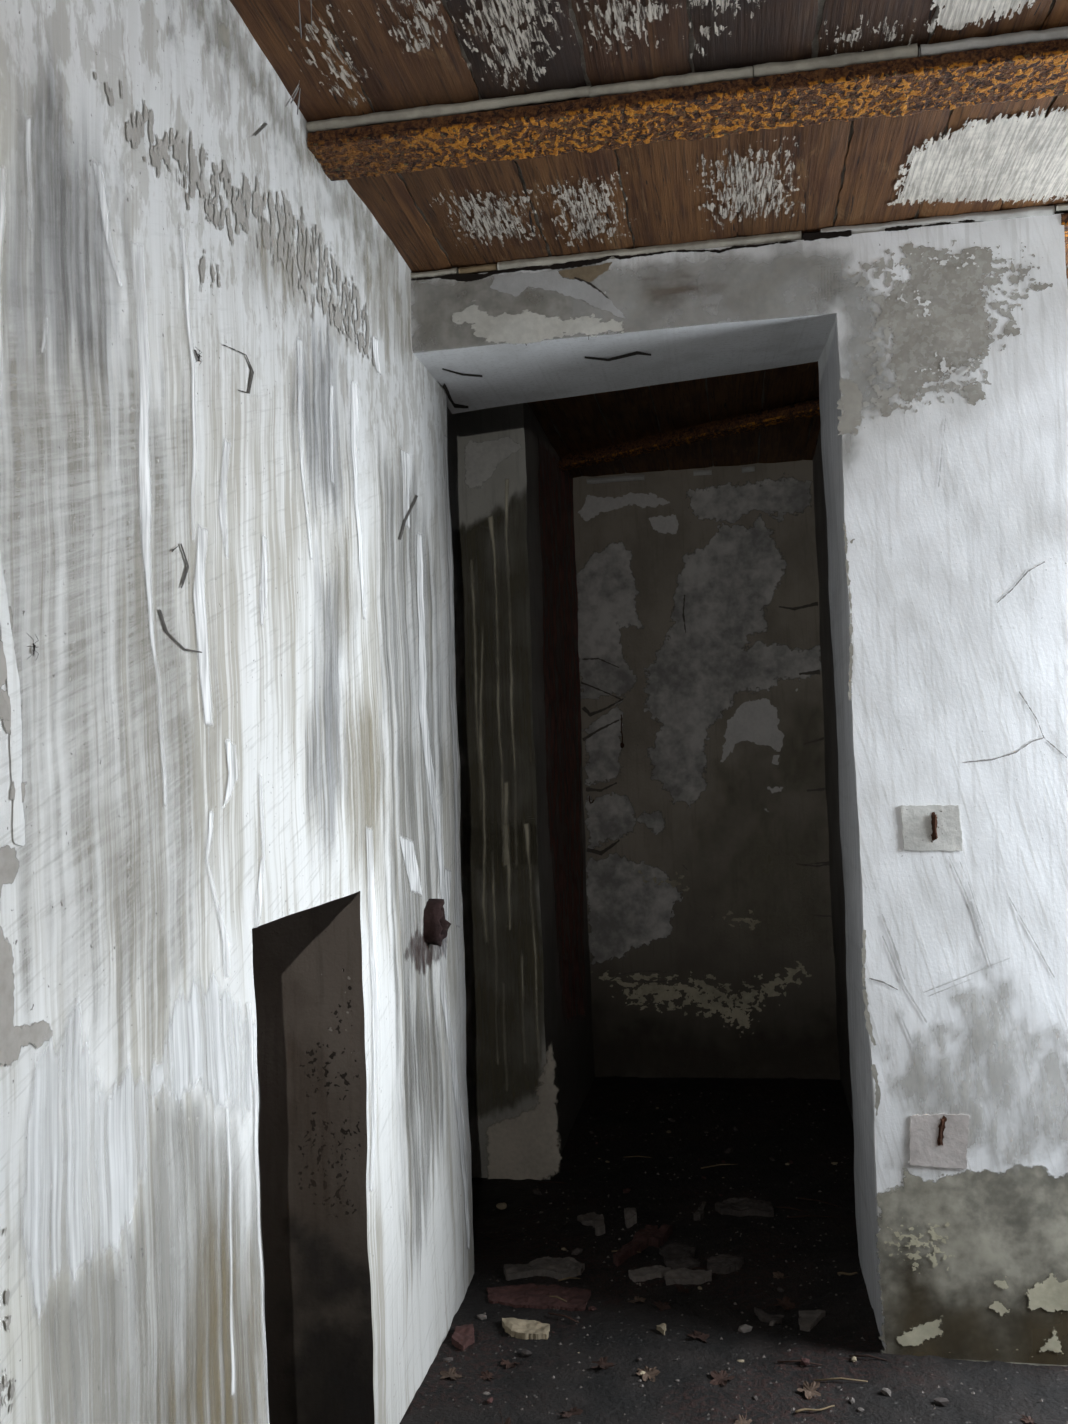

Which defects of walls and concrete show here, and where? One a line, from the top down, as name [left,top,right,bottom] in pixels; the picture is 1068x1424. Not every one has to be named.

damp [38,86,106,375]
peeling [126,100,375,366]
peeling [430,172,631,249]
peeling [490,262,625,318]
peeling [837,240,1053,435]
damp [10,358,192,956]
peeling [0,926,53,1067]
damp [296,968,366,1218]
damp [54,1103,258,1424]
damp [295,1332,373,1424]
peeling [876,1162,1068,1355]
damp [894,1267,1068,1365]